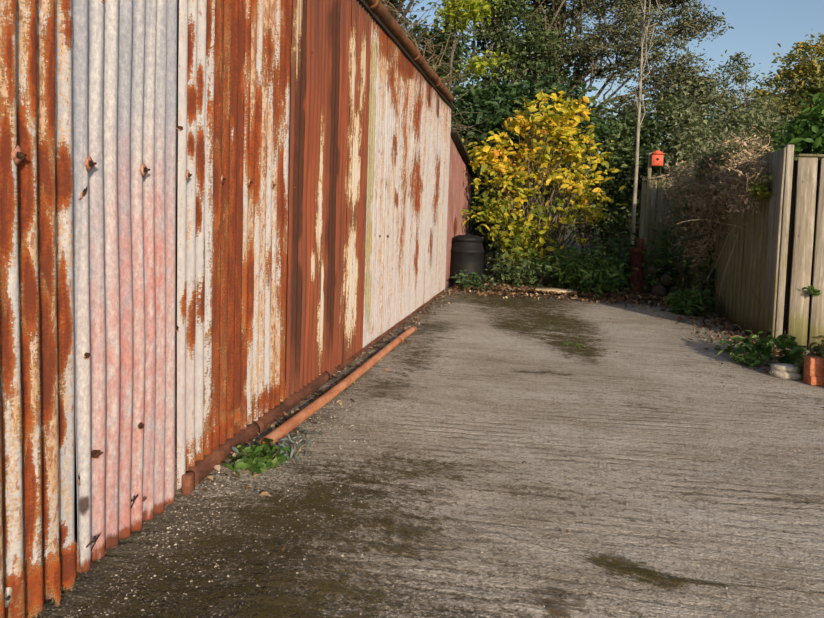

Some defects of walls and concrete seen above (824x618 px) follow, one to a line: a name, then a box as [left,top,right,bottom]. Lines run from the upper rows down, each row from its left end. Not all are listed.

corrosion [0,0,80,618]
corrosion [175,0,292,486]
corrosion [367,12,441,289]